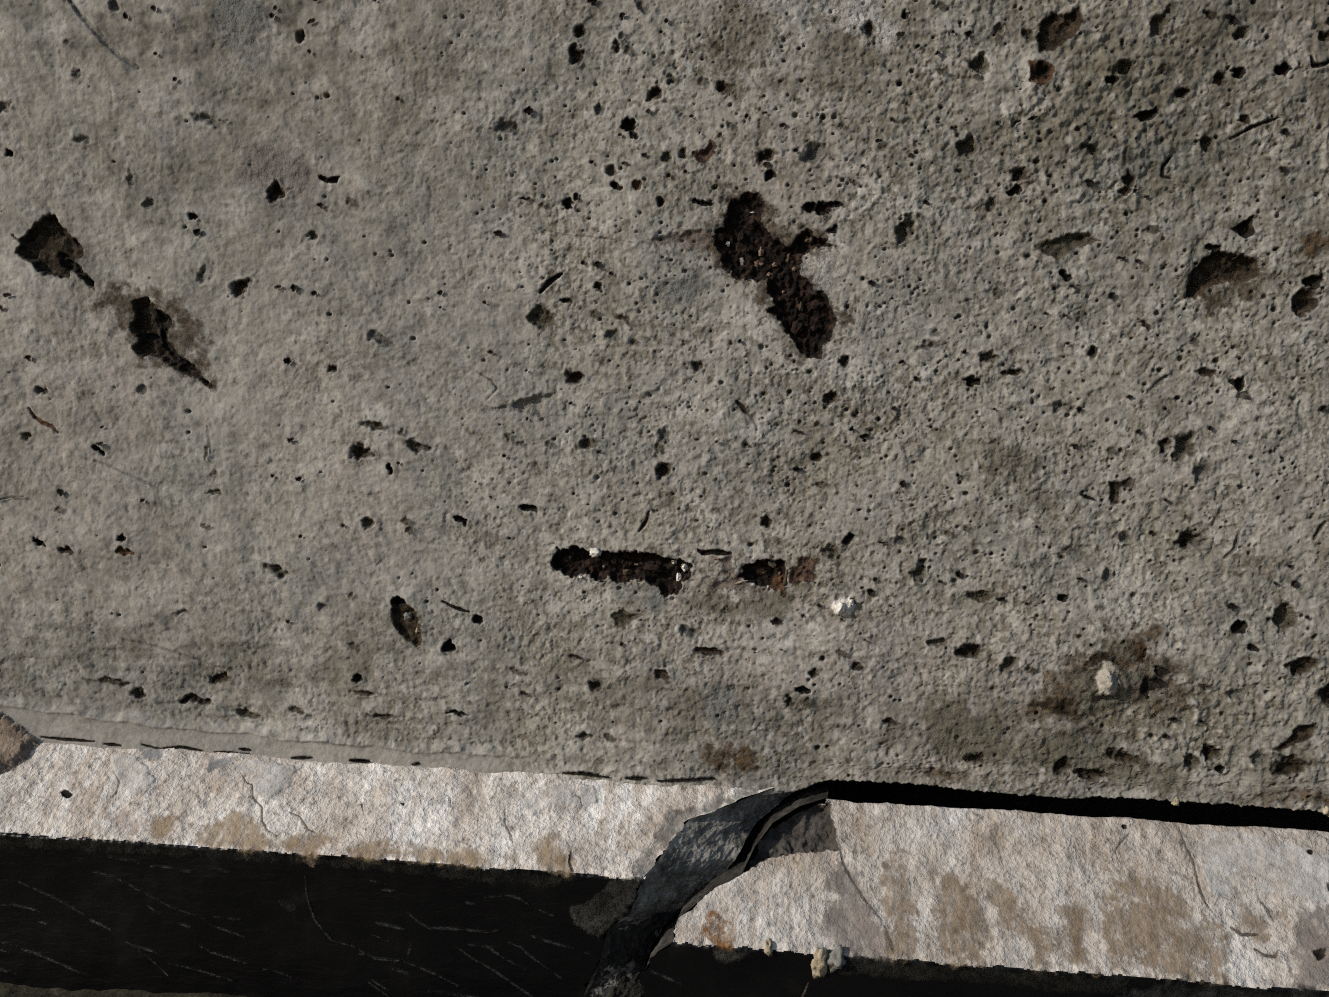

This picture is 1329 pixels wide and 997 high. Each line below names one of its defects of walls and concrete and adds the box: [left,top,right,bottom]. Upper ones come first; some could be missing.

spalling [12,213,95,289]
corrosion [651,184,854,364]
spalling [1184,215,1266,317]
spalling [129,297,214,389]
peeling [570,787,757,936]
spalling [743,800,839,873]